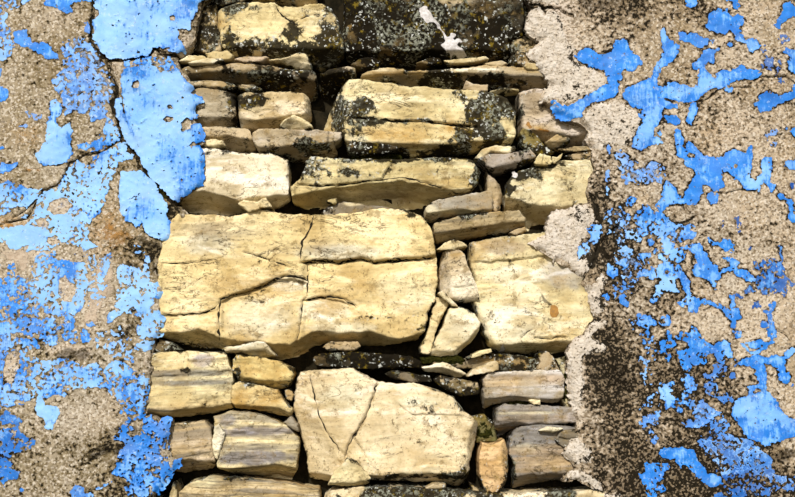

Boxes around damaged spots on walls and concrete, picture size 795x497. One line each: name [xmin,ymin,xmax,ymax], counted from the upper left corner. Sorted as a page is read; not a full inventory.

crack [0,1,181,225]
peeling [524,0,795,497]
crack [310,379,379,457]